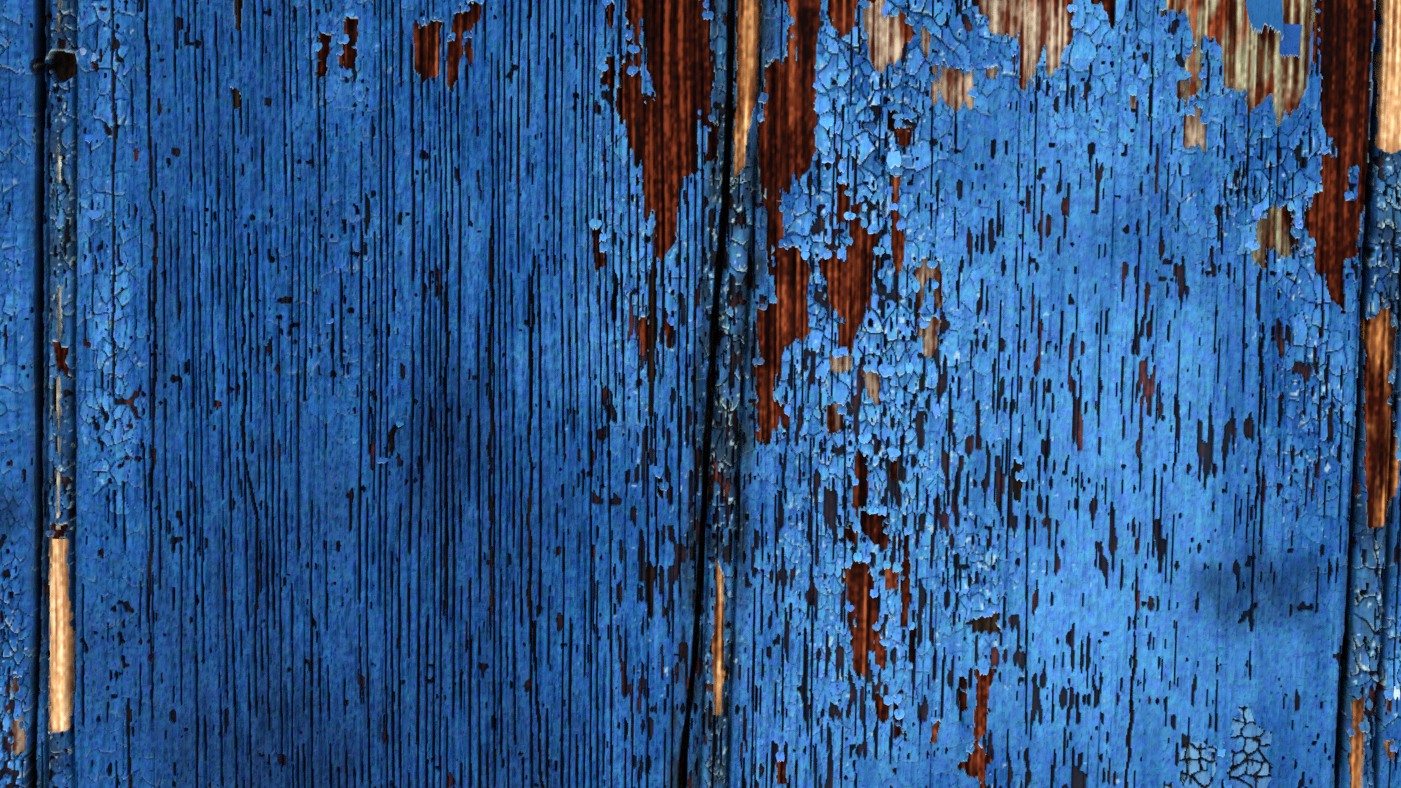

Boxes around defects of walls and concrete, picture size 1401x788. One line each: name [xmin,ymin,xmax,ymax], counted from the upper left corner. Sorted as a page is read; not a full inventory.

peeling [315,12,358,78]
peeling [414,0,484,92]
peeling [597,0,722,261]
peeling [1159,0,1375,313]
peeling [589,219,609,270]
peeling [752,0,1115,445]
peeling [827,395,917,677]
peeling [972,604,1000,634]
peeling [875,693,906,739]
peeling [958,665,995,788]
crack [1124,632,1136,788]
crack [1164,706,1271,788]